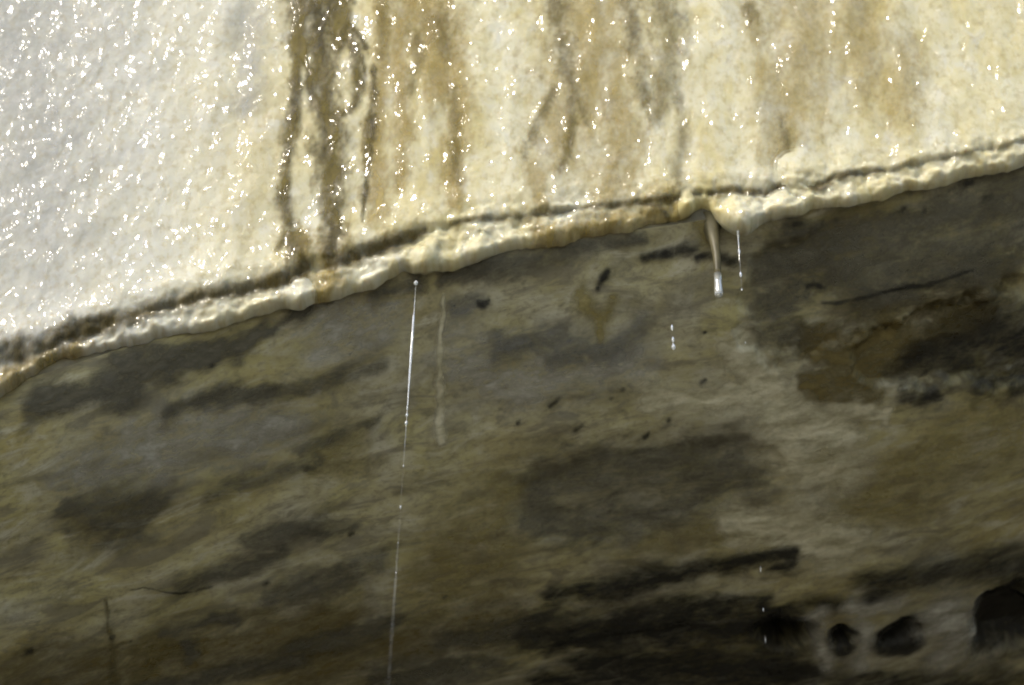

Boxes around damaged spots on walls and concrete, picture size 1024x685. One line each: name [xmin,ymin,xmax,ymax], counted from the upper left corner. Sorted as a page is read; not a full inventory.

leakage [0,0,1024,548]
crack [806,270,972,305]
leakage [178,516,357,592]